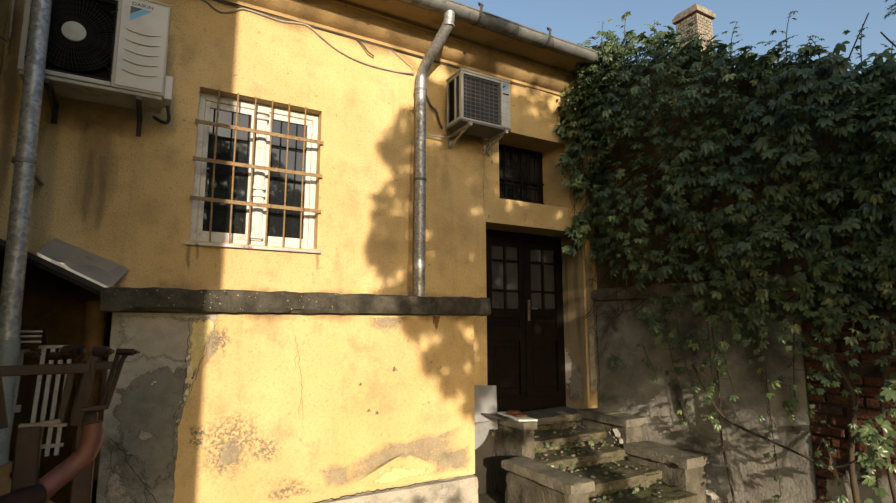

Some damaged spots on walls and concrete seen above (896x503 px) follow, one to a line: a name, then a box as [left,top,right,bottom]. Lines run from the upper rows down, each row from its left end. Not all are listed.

spalling [113,316,220,488]
crack [294,334,303,433]
leakage [324,432,467,484]